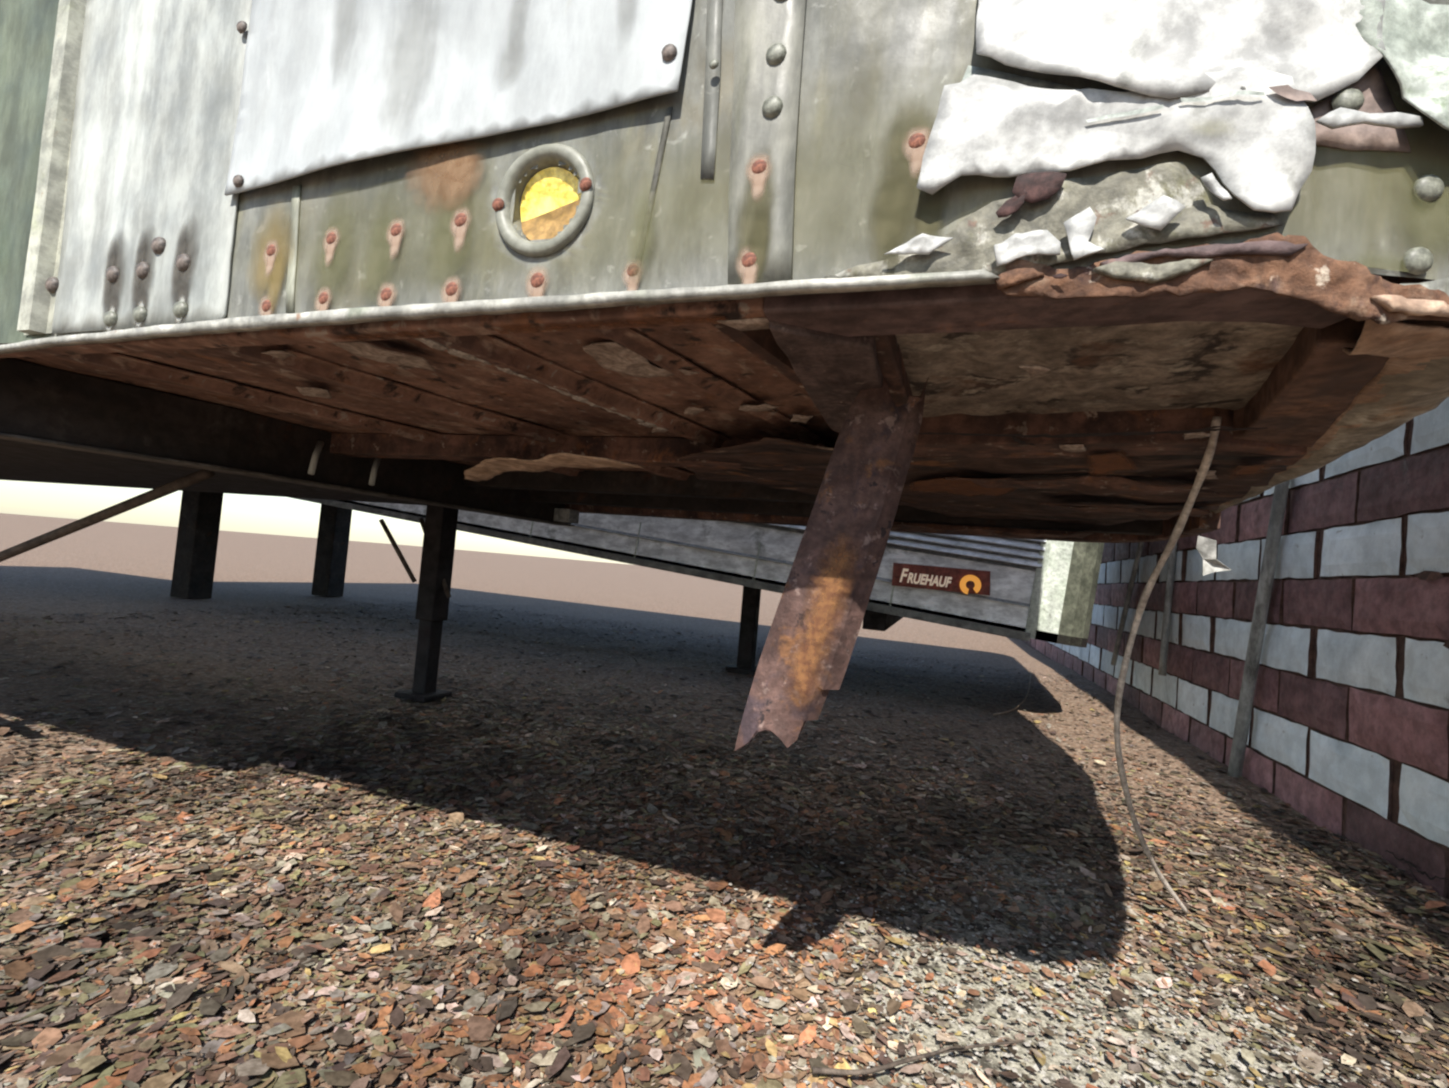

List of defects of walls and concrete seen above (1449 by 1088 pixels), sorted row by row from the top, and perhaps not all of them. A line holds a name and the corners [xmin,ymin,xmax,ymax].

rust [790,539,853,698]